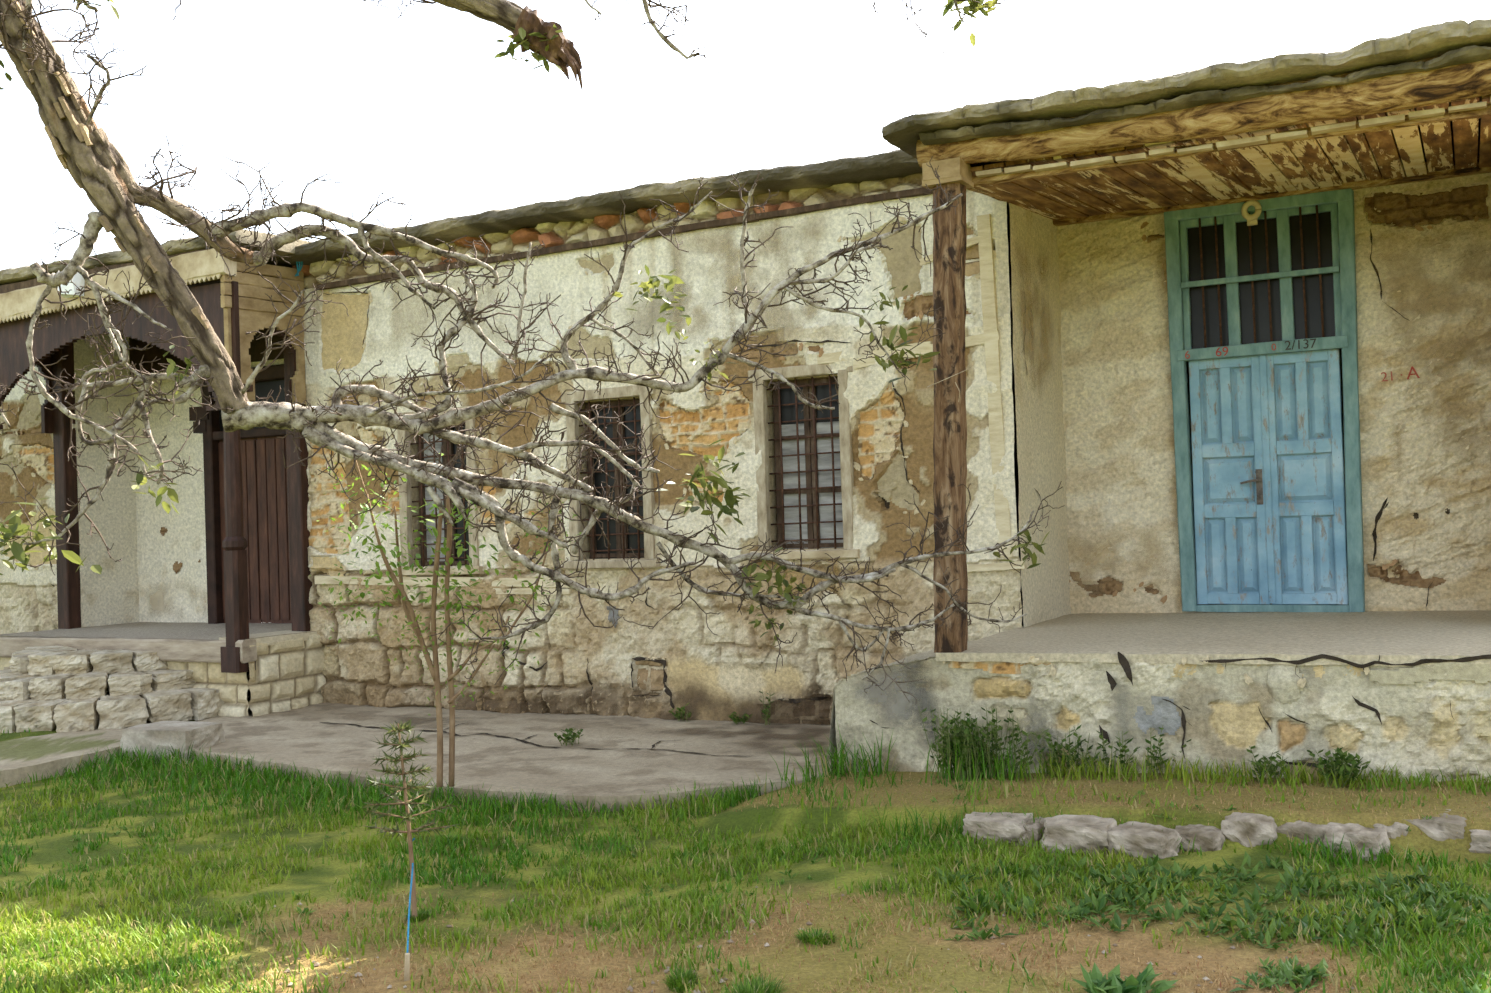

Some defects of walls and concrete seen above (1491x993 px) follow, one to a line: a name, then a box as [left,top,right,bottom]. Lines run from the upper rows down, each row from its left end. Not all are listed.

flaking render [1364,184,1489,231]
crack [1370,228,1410,321]
flaking render [317,292,373,374]
flaking render [653,378,751,457]
flaking render [852,382,926,515]
flaking render [683,480,726,504]
crack [1372,497,1389,561]
flaking render [1069,572,1167,604]
flaking render [1368,559,1446,588]